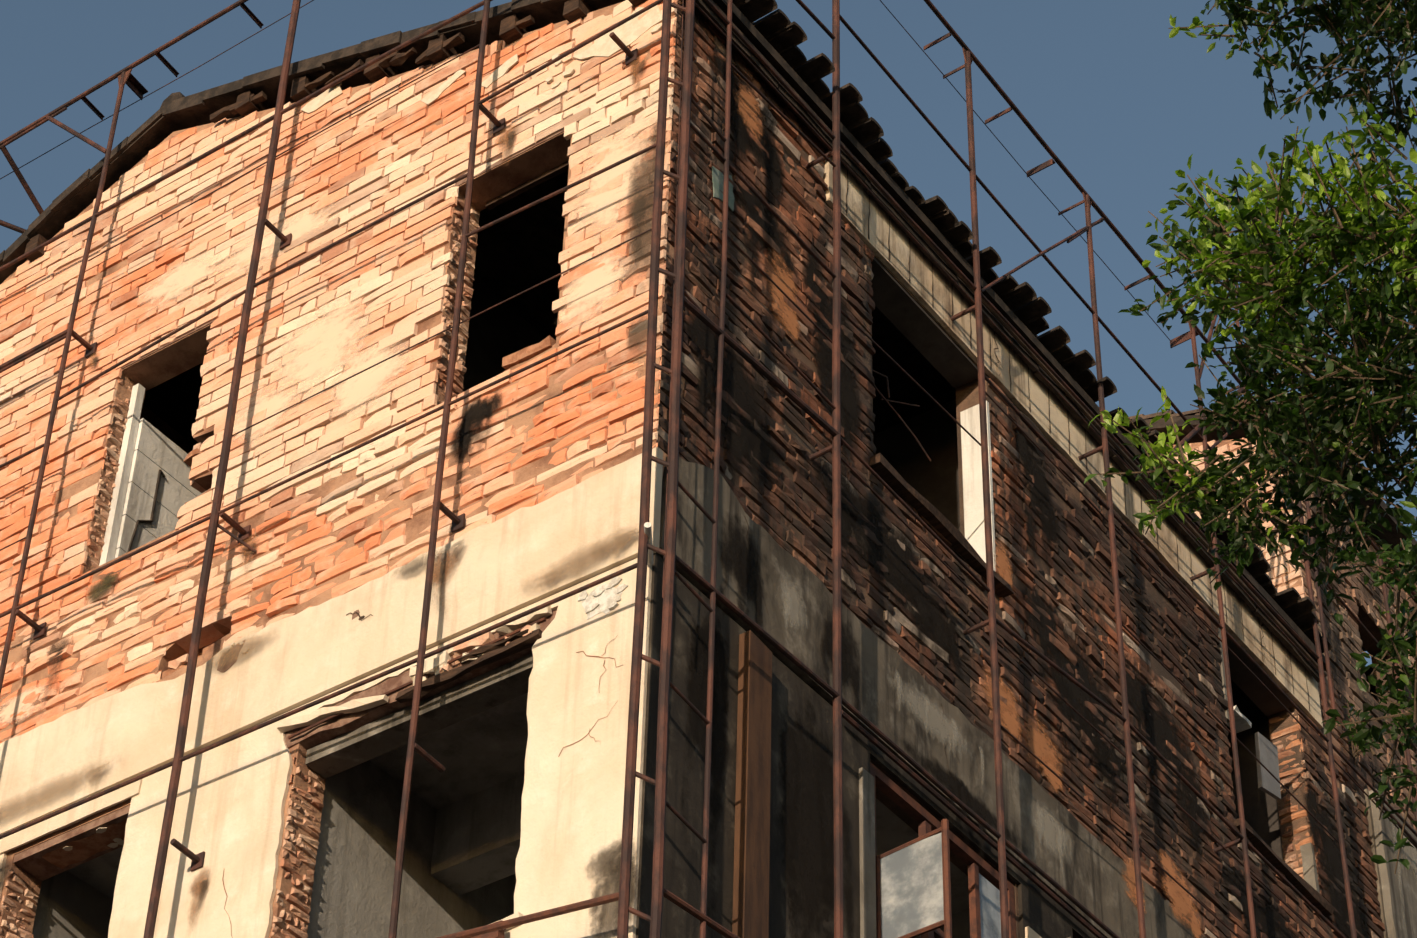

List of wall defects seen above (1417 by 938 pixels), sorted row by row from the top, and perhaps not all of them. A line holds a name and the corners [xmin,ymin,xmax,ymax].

water stain [451,393,501,457]
water stain [686,312,780,484]
water stain [707,49,960,671]
spalling [271,605,557,938]
crack [558,636,622,757]
peeling [578,576,628,620]
water stain [687,623,727,862]
water stain [780,704,853,938]
water stain [821,616,859,710]
water stain [1015,426,1212,852]
water stain [1219,857,1298,938]
water stain [1304,780,1368,938]